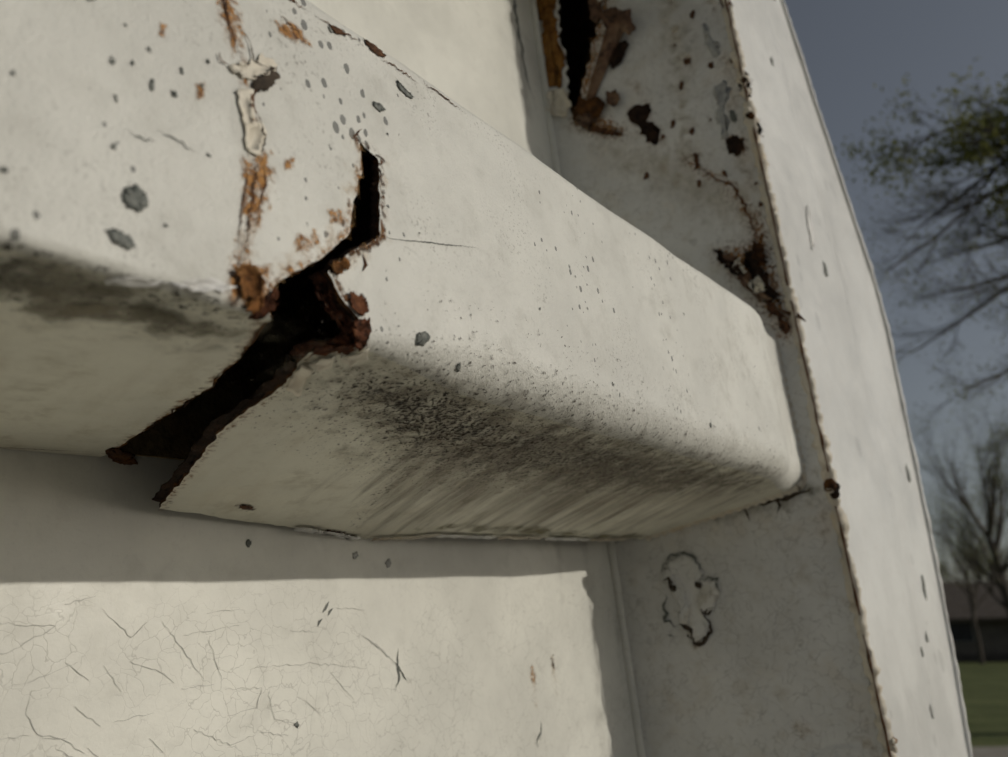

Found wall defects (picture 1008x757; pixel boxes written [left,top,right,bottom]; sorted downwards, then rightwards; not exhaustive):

corrosion [276,21,311,45]
peeling [606,89,620,107]
peeling [626,103,676,145]
peeling [713,70,752,157]
water stain [0,241,247,338]
corrosion [229,262,280,348]
corrosion [287,139,386,359]
water stain [245,303,783,505]
peeling [661,551,720,647]
crack [0,596,408,757]